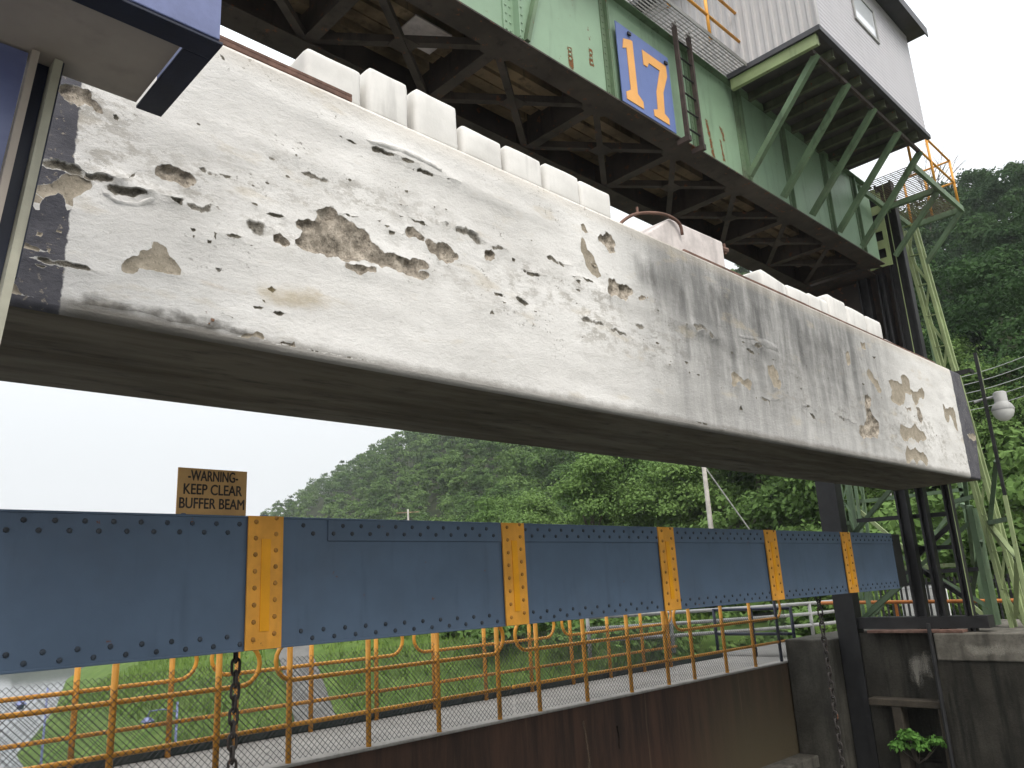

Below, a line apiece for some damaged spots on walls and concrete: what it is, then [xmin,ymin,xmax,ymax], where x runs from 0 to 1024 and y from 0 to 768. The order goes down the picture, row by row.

spalling [58,84,120,121]
peeling [33,173,95,210]
spalling [154,163,198,188]
peeling [121,241,185,276]
spalling [246,206,459,281]
spalling [580,223,659,311]
peeling [846,342,937,466]
peeling [943,404,976,441]